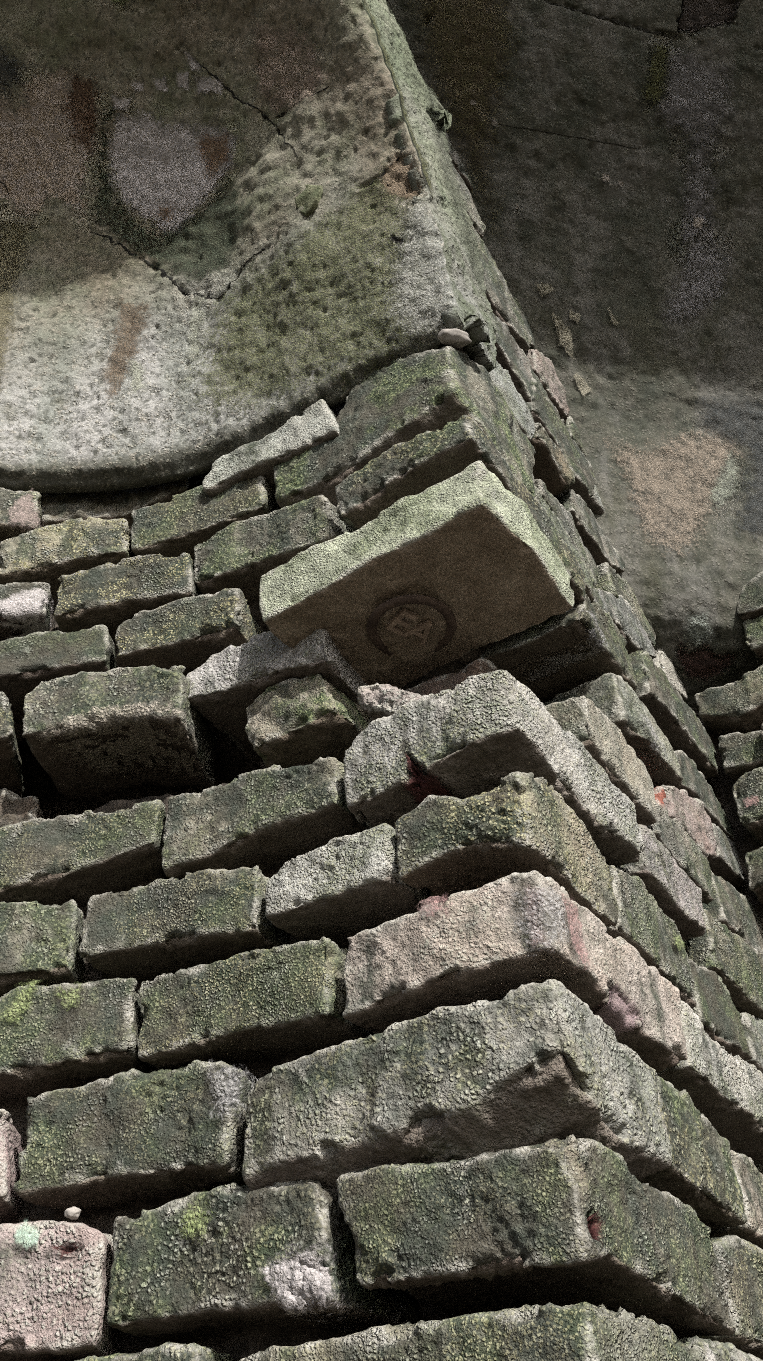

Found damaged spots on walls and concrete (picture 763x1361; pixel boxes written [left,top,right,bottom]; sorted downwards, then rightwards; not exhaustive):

spalling [678,0,740,32]
crack [178,50,329,156]
crack [90,232,276,299]